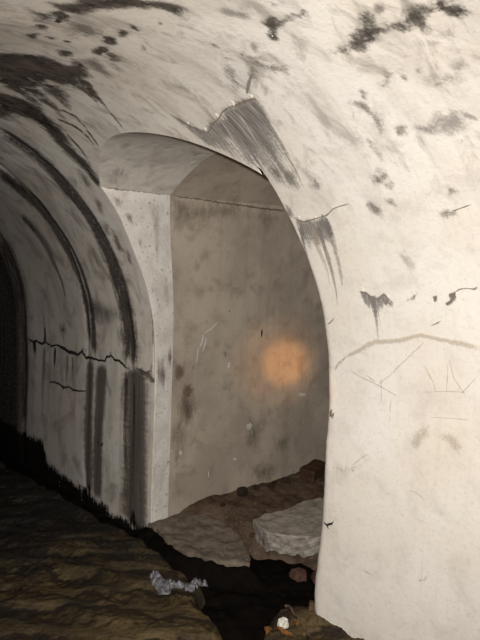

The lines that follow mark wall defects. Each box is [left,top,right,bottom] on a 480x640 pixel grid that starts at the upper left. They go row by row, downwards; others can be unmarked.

leakage [340,12,385,53]
leakage [394,1,466,31]
leakage [0,25,138,185]
leakage [0,130,147,534]
crack [29,327,129,369]
crack [49,381,85,392]